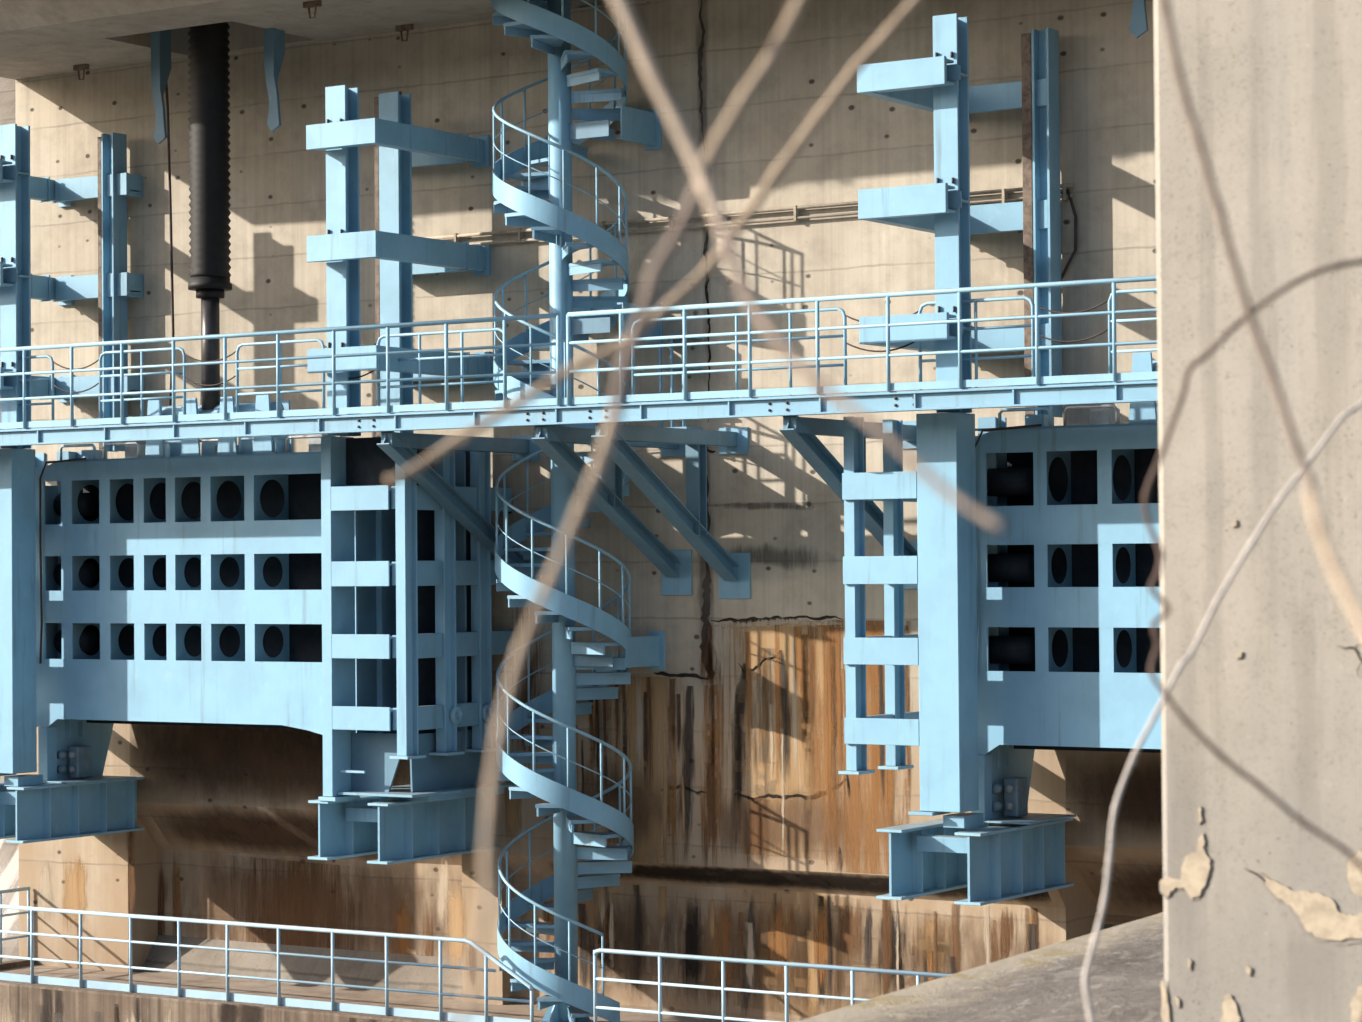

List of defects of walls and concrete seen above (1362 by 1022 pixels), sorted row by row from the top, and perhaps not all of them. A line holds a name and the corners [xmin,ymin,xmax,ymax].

corrosion [576,620,911,875]
peeling [1159,807,1213,901]
peeling [1258,850,1362,946]
corrosion [708,890,861,1017]
leakage [40,989,63,1022]
leakage [96,998,139,1022]
leakage [209,1003,261,1022]
peeling [1160,979,1191,1022]
peeling [1220,994,1242,1022]
peeling [1349,986,1362,1022]